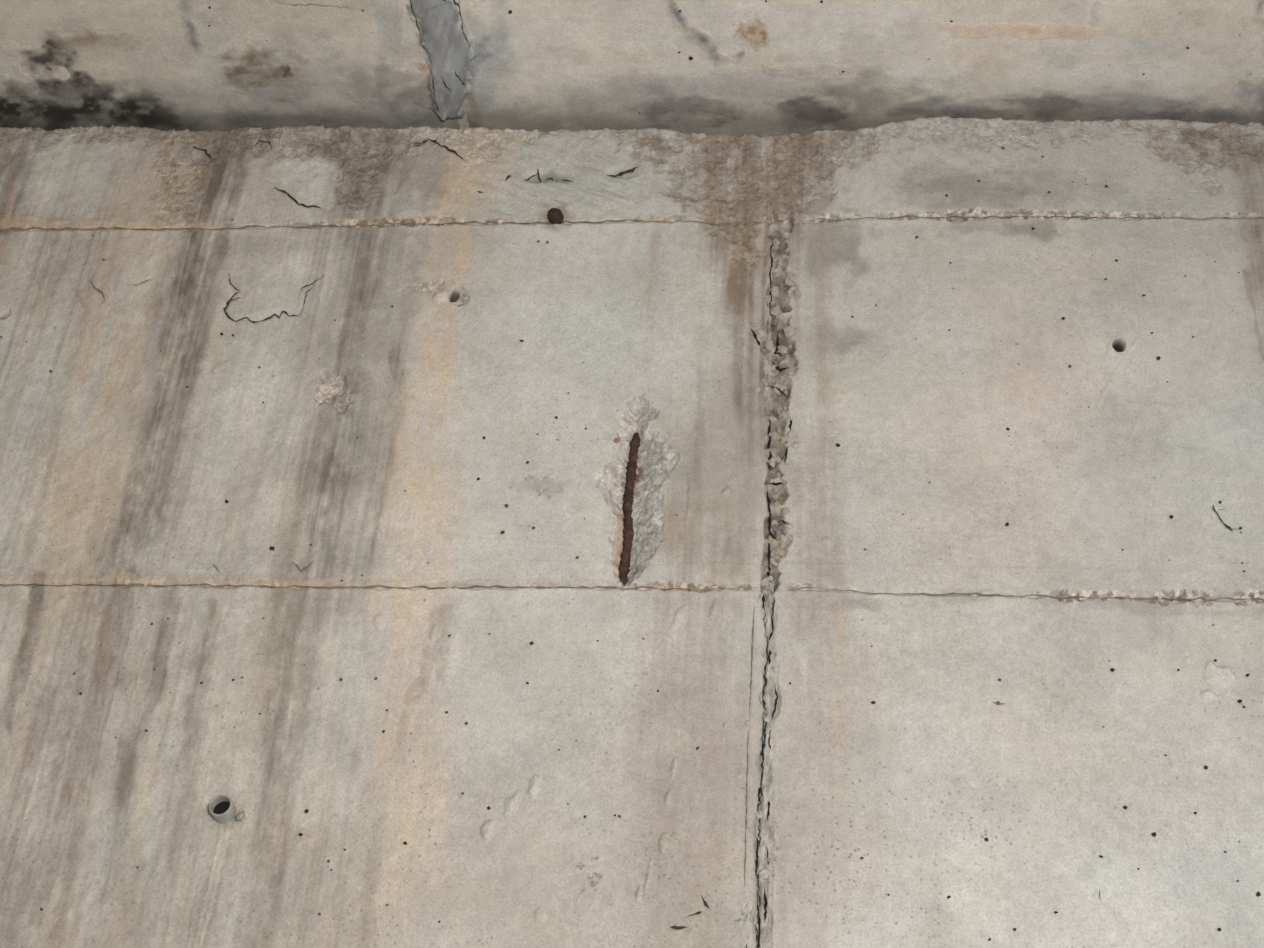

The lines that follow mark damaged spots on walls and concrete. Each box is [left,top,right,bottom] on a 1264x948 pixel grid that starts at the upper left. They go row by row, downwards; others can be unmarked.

leakage [0,23,224,138]
crack [410,0,471,160]
crack [223,272,325,323]
crack [274,186,320,208]
crack [478,169,574,193]
rust [535,198,579,237]
crack [608,167,637,179]
leakage [1224,157,1264,379]
leakage [0,142,864,948]
rust [607,510,625,579]
spalling [589,390,682,590]
crack [744,594,769,948]